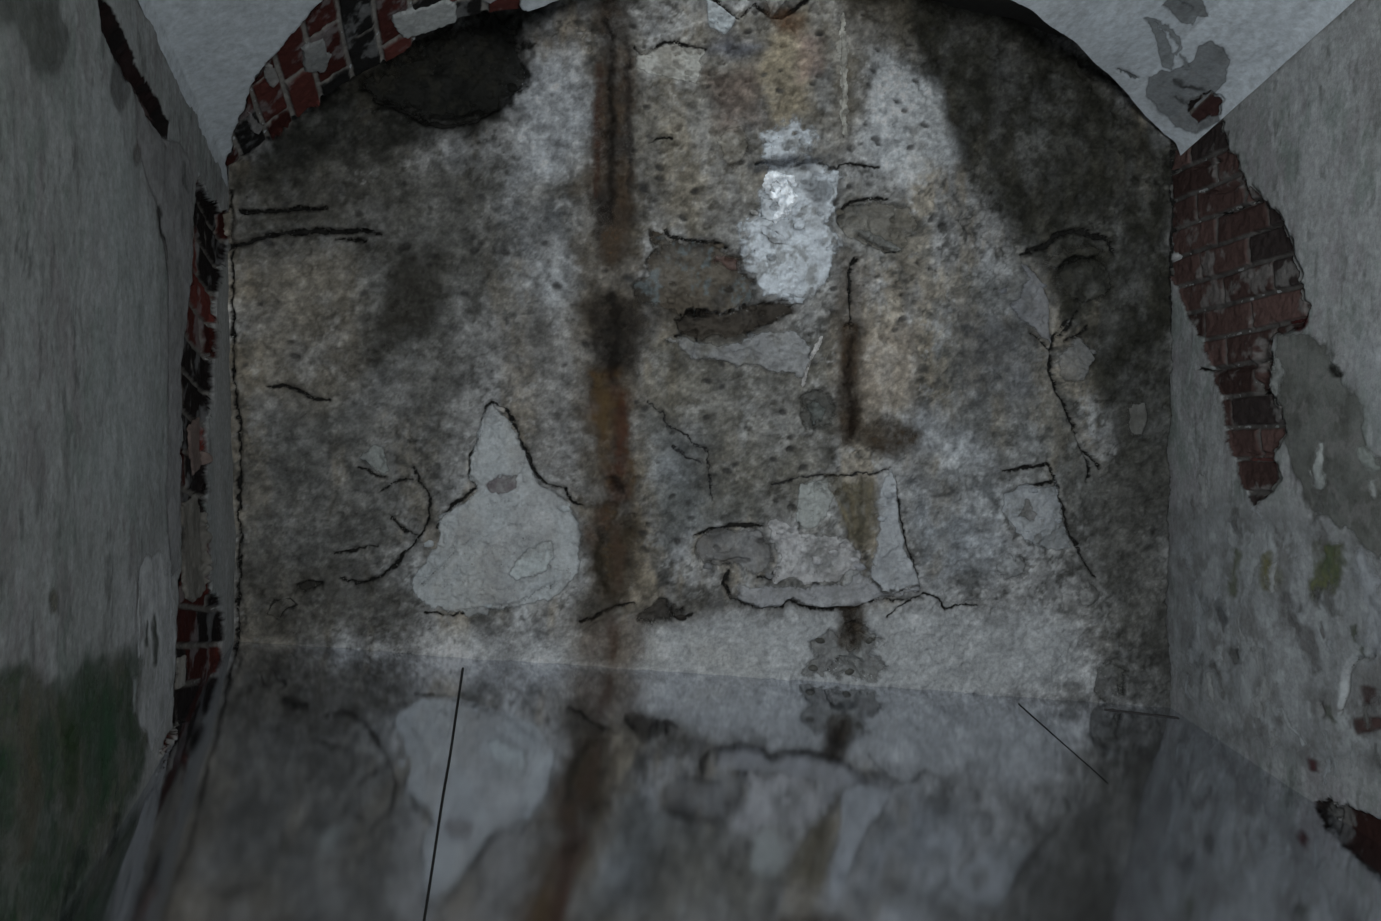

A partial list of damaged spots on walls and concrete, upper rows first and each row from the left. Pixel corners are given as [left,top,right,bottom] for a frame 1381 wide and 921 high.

flaking render [225,0,521,177]
flaking render [133,92,229,761]
crack [229,189,382,640]
crack [334,401,583,585]
flaking render [412,404,582,617]
peeling [633,119,918,430]
flaking render [695,469,920,683]
crack [647,400,978,618]
corrosion [838,605,864,648]
crack [847,245,896,324]
corrosion [839,323,921,455]
crack [1002,310,1100,578]